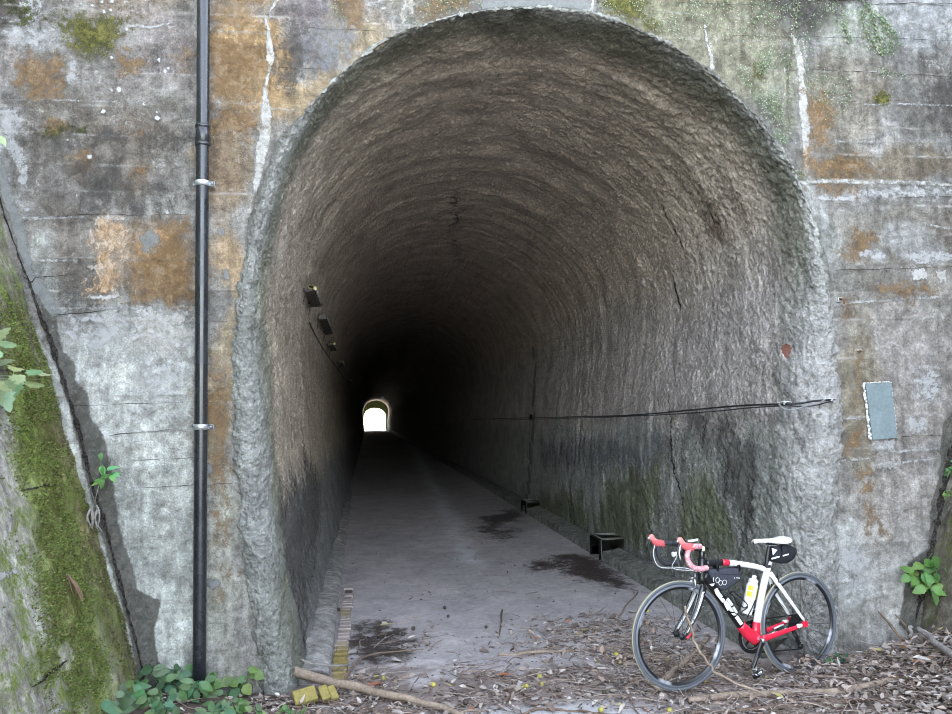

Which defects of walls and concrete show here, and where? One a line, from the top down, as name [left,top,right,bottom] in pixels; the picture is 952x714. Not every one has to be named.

rust [9,44,72,135]
rust [209,0,275,145]
damp [253,0,279,193]
damp [782,33,811,168]
rust [799,81,875,198]
rust [82,214,195,311]
damp [280,440,322,646]